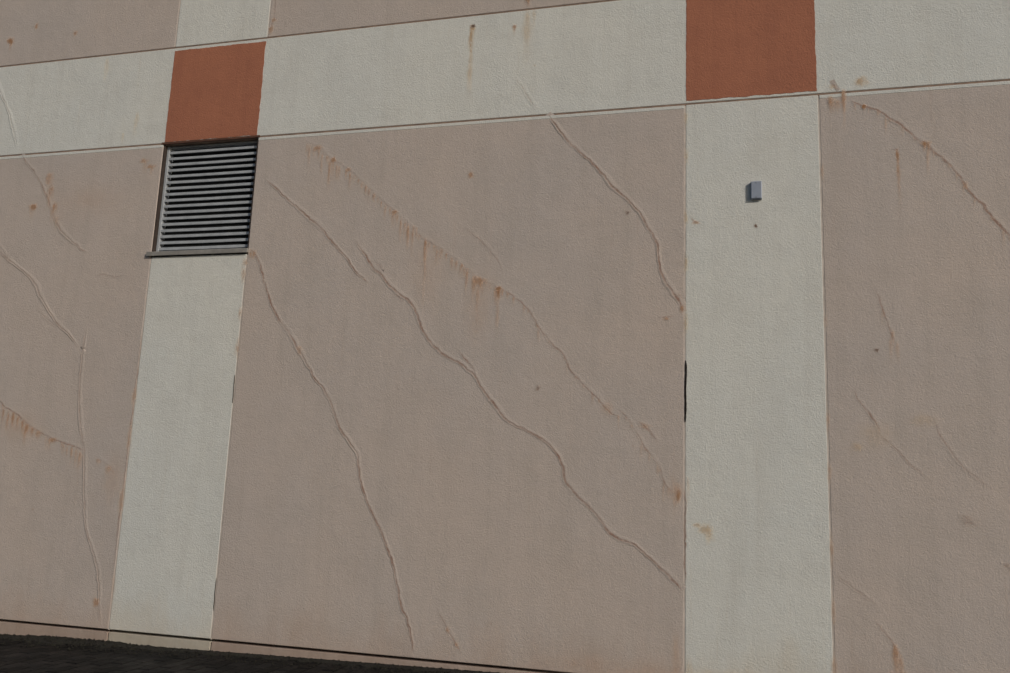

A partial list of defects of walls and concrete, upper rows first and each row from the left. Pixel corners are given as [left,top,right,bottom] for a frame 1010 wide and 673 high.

crack [0,81,88,253]
crack [545,112,687,312]
crack [850,98,1010,240]
crack [250,248,415,652]
crack [265,178,686,593]
crack [681,360,689,422]